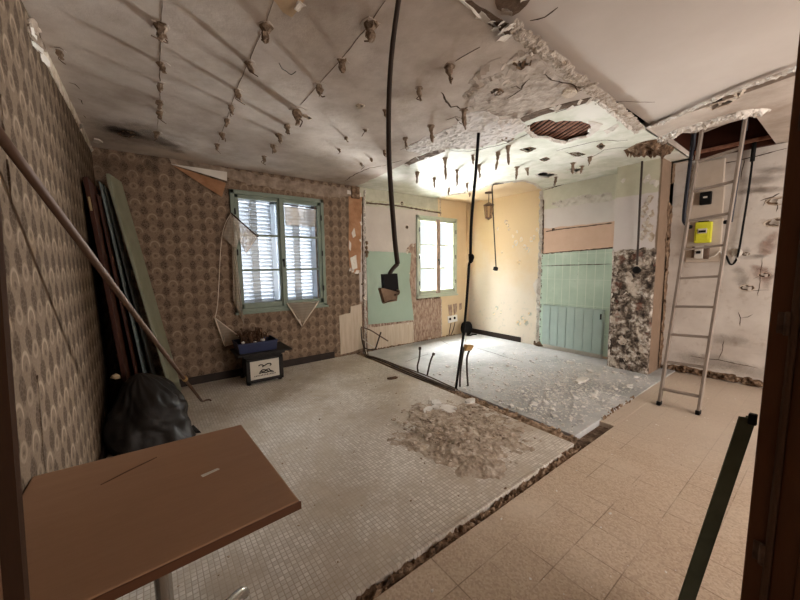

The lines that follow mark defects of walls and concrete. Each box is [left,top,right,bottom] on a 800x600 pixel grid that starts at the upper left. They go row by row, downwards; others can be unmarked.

damp [109,127,139,136]
flaking render [464,11,796,184]
flaking render [169,158,440,274]
flaking render [367,243,441,349]
spalling [607,174,673,374]